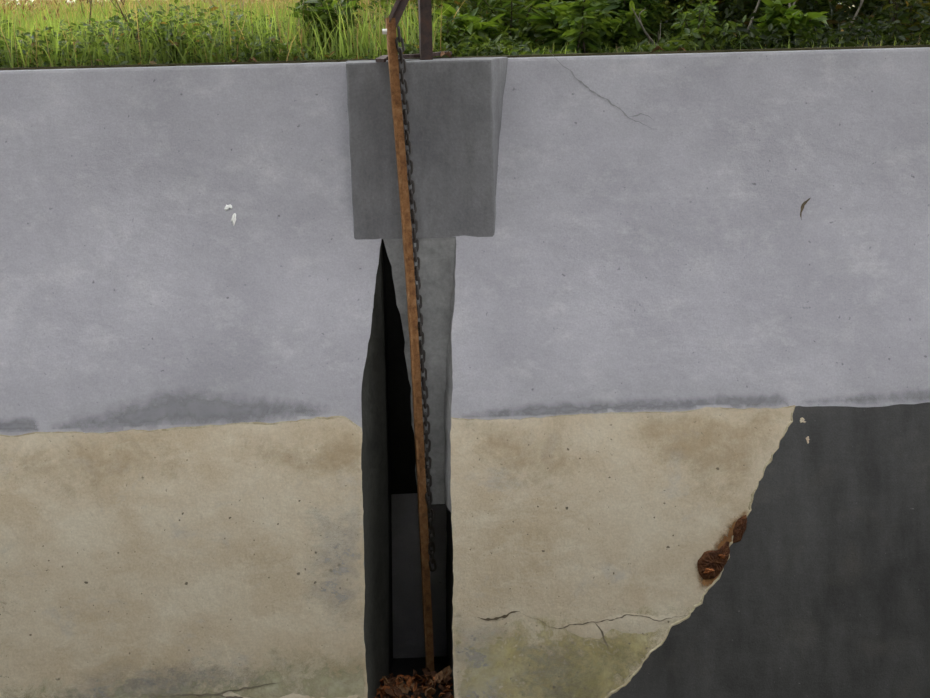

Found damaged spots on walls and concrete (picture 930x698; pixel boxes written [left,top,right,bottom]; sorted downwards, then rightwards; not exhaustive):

crack [549,50,653,128]
peeling [0,416,368,698]
peeling [450,405,806,698]
corrosion [714,512,745,551]
crack [478,611,687,651]
crack [144,683,276,698]